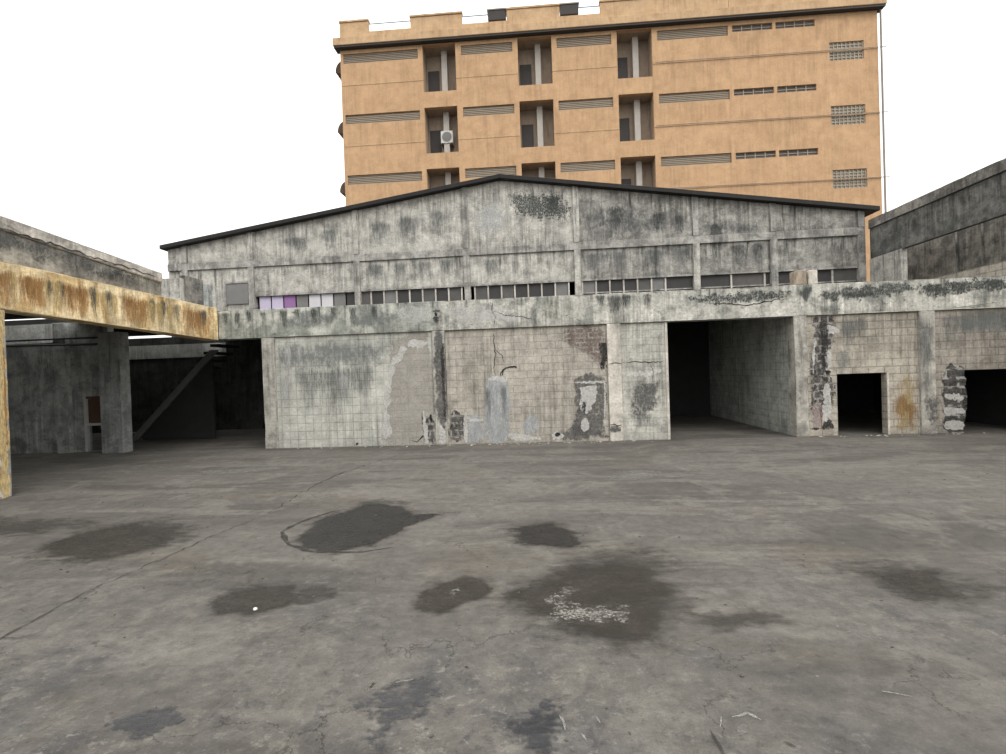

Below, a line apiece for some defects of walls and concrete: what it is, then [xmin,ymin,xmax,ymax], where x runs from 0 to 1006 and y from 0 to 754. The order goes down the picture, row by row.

water stain [509,190,572,222]
corrosion [0,273,211,499]
water stain [280,339,379,402]
peeling [382,306,446,446]
peeling [463,412,488,443]
spalling [564,326,621,433]
peeling [812,383,832,430]
peeling [812,325,840,372]
peeling [941,363,967,433]
water stain [0,519,195,563]
water stain [280,500,438,553]
water stain [418,522,788,646]